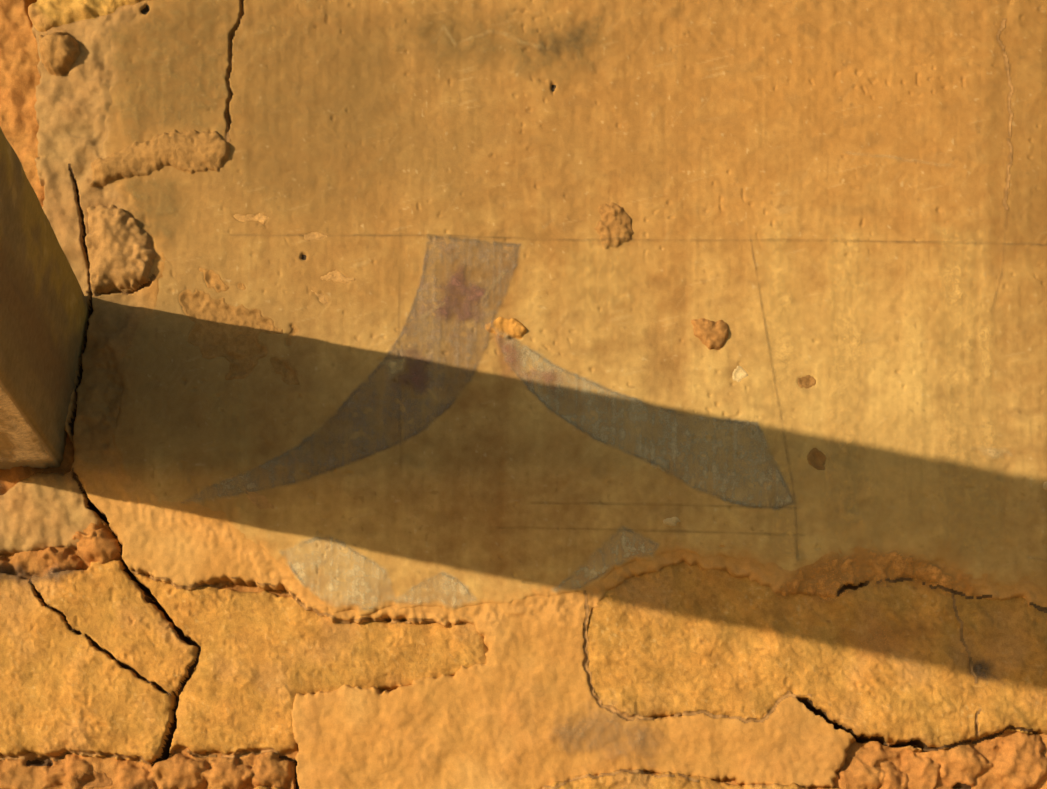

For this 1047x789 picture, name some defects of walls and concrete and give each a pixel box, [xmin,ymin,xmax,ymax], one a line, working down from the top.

crack [225,0,245,144]
crack [68,163,156,435]
crack [0,468,434,789]
crack [582,577,1038,752]
crack [1029,602,1047,613]